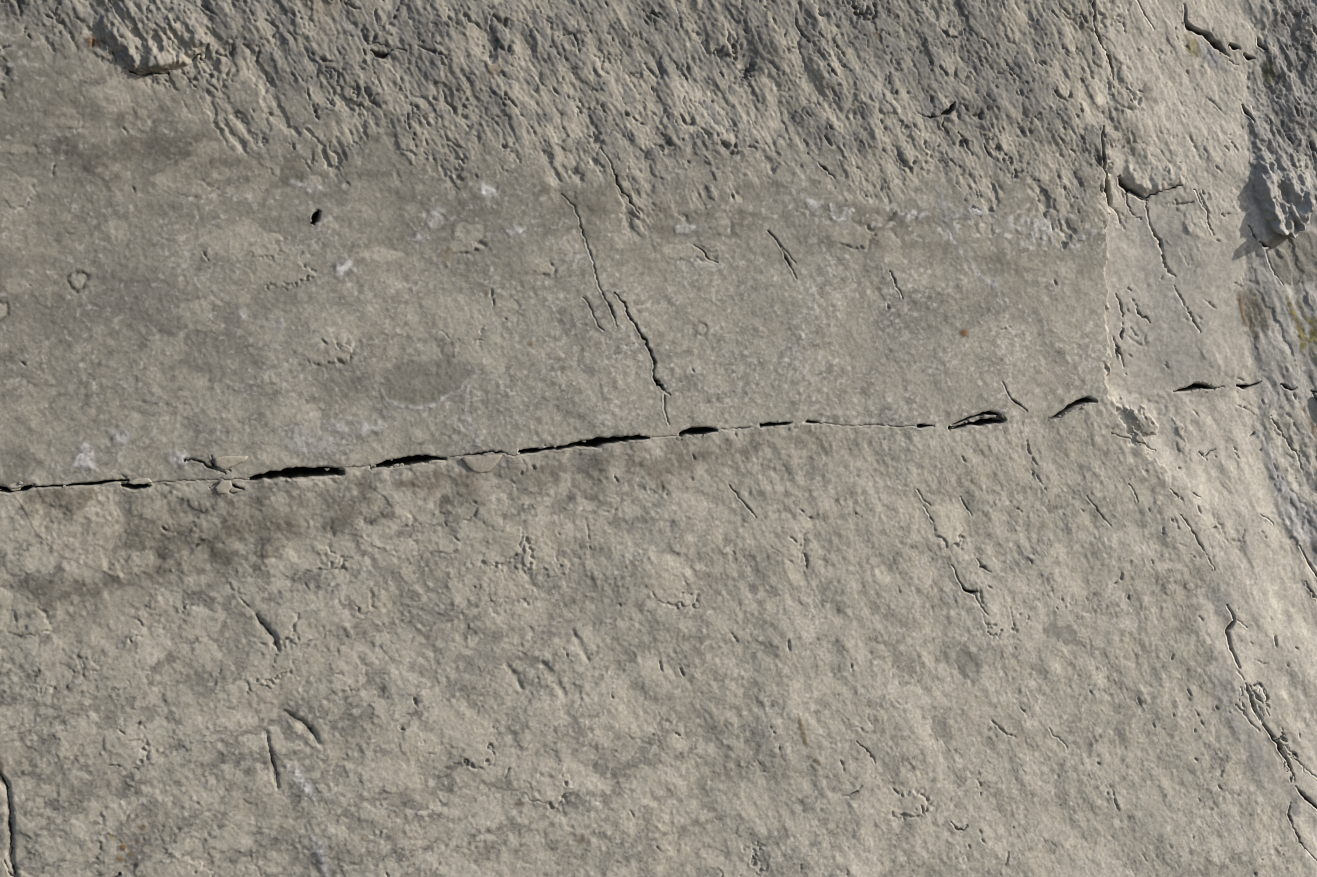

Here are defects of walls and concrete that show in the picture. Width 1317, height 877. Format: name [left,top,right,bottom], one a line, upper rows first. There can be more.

crack [1240,104,1256,123]
crack [1099,126,1215,332]
crack [1248,226,1284,286]
crack [0,193,1097,496]
crack [1111,294,1150,376]
crack [1111,431,1156,452]
crack [1173,380,1317,469]
crack [1086,495,1112,528]
crack [1169,488,1216,570]
crack [1298,545,1317,602]
crack [1223,605,1317,864]
crack [0,772,18,877]